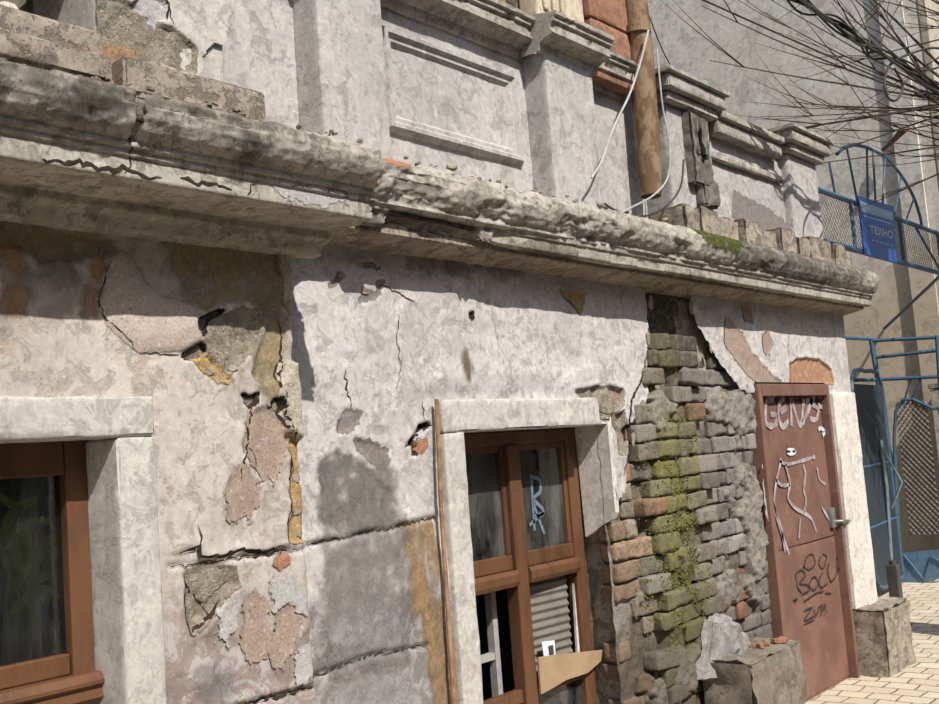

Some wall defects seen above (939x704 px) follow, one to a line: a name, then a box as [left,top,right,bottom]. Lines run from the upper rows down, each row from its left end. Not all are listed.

spalling [97,0,199,74]
crack [43,97,259,194]
crack [98,261,135,350]
spalling [181,293,305,544]
spalling [405,402,432,456]
spalling [575,385,635,455]
peeling [320,437,391,531]
crack [171,517,435,568]
peeling [184,561,313,687]